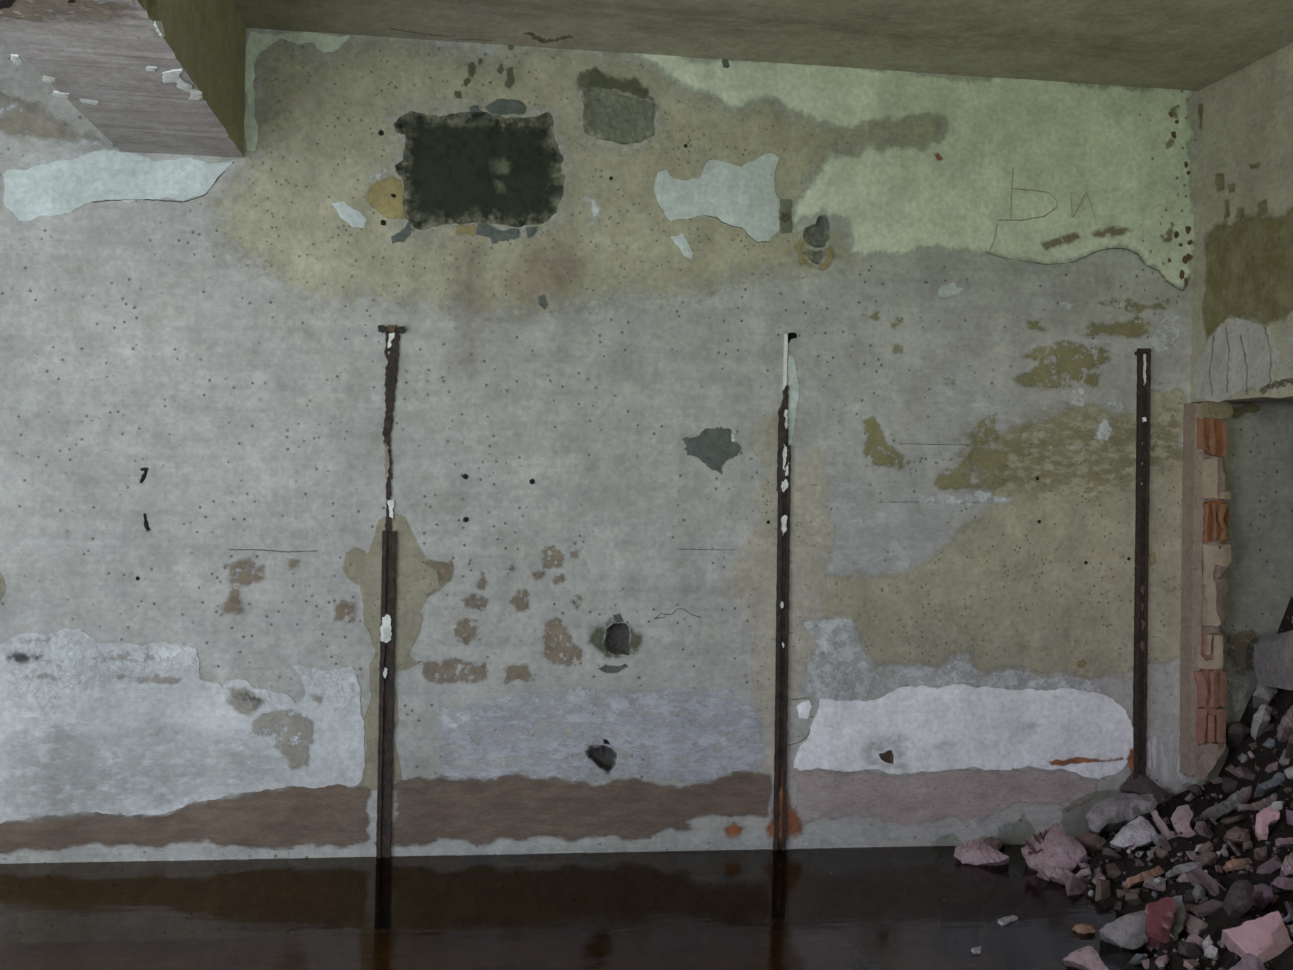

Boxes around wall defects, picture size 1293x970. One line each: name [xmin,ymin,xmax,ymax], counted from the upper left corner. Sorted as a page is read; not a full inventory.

spalling [153,21,165,37]
leakage [490,158,511,192]
spalling [2,31,1195,317]
corrosion [382,331,400,538]
corrosion [777,385,791,492]
spalling [436,317,1280,785]
leakage [0,785,370,890]
leakage [391,772,774,871]
corrosion [767,786,801,840]
leakage [786,768,1097,858]